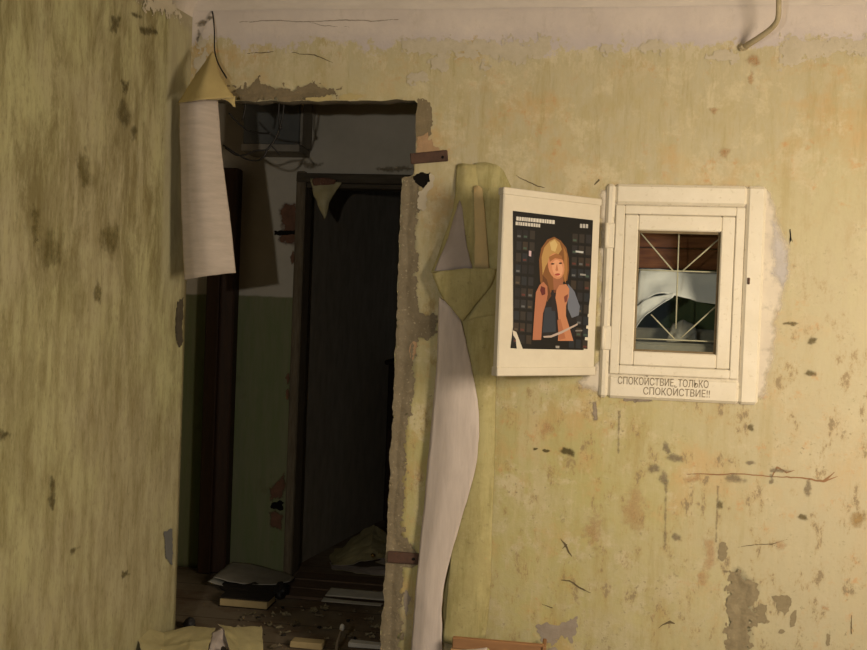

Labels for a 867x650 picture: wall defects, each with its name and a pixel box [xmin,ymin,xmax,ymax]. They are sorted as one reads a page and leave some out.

peeling [136,0,182,24]
water stain [120,80,137,135]
flaking render [221,75,363,102]
flaking render [416,98,443,153]
flaking render [274,203,296,264]
flaking render [380,172,438,650]
crack [687,467,838,482]
flaking render [718,542,797,650]
flaking render [535,616,578,650]